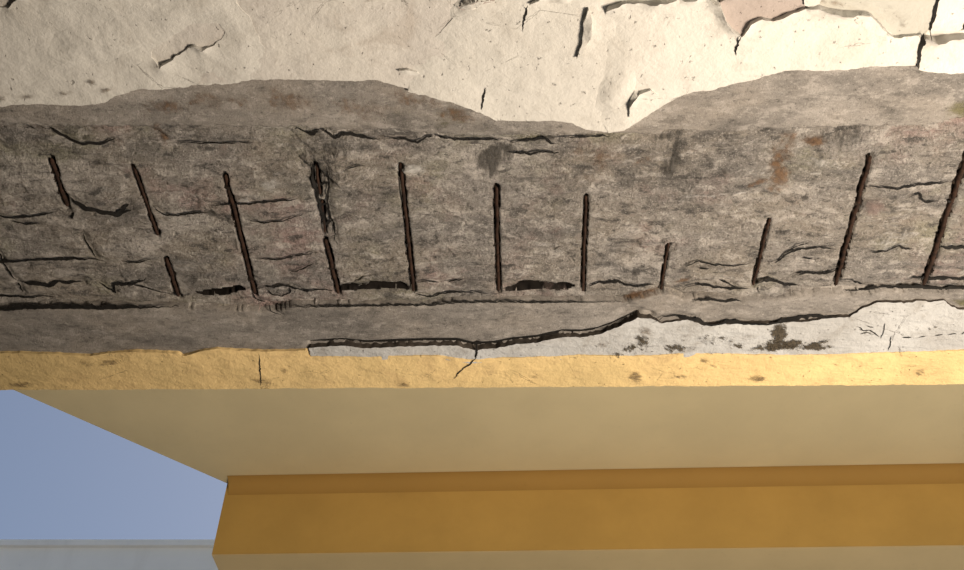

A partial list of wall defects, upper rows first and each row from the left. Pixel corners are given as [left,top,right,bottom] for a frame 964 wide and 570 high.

crack [295,127,608,156]
spalling [0,0,964,310]
crack [0,196,131,225]
crack [0,234,177,311]
rust [398,162,416,291]
crack [155,163,964,378]
rust [580,193,589,291]
rust [833,153,872,286]
rust [920,151,964,285]
water stain [616,330,650,358]
flaking render [309,299,964,364]
water stain [699,317,833,352]